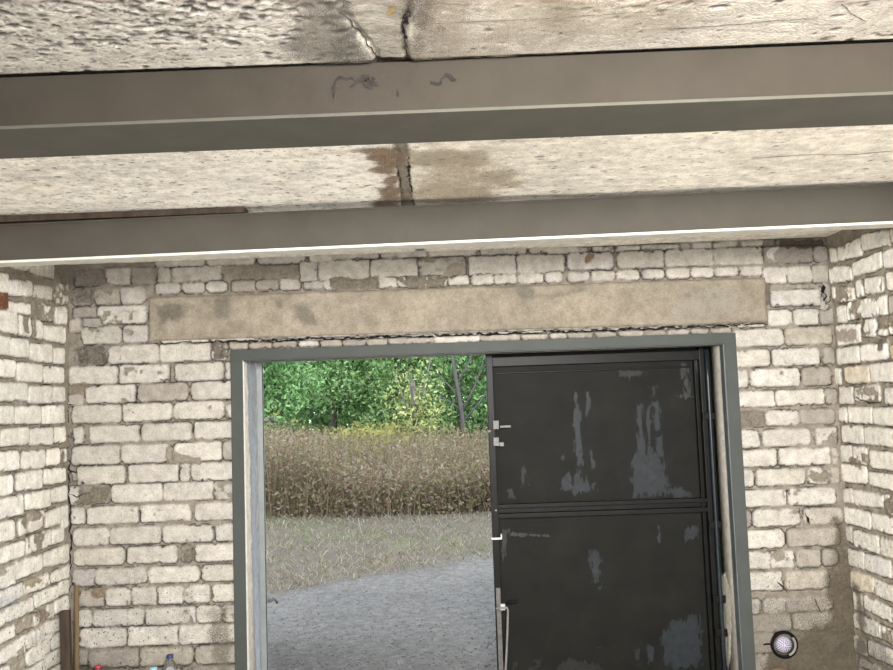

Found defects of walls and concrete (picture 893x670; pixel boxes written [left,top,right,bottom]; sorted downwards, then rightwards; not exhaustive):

crack [341,0,377,58]
leakage [248,0,720,64]
crack [401,0,638,56]
leakage [347,141,542,207]